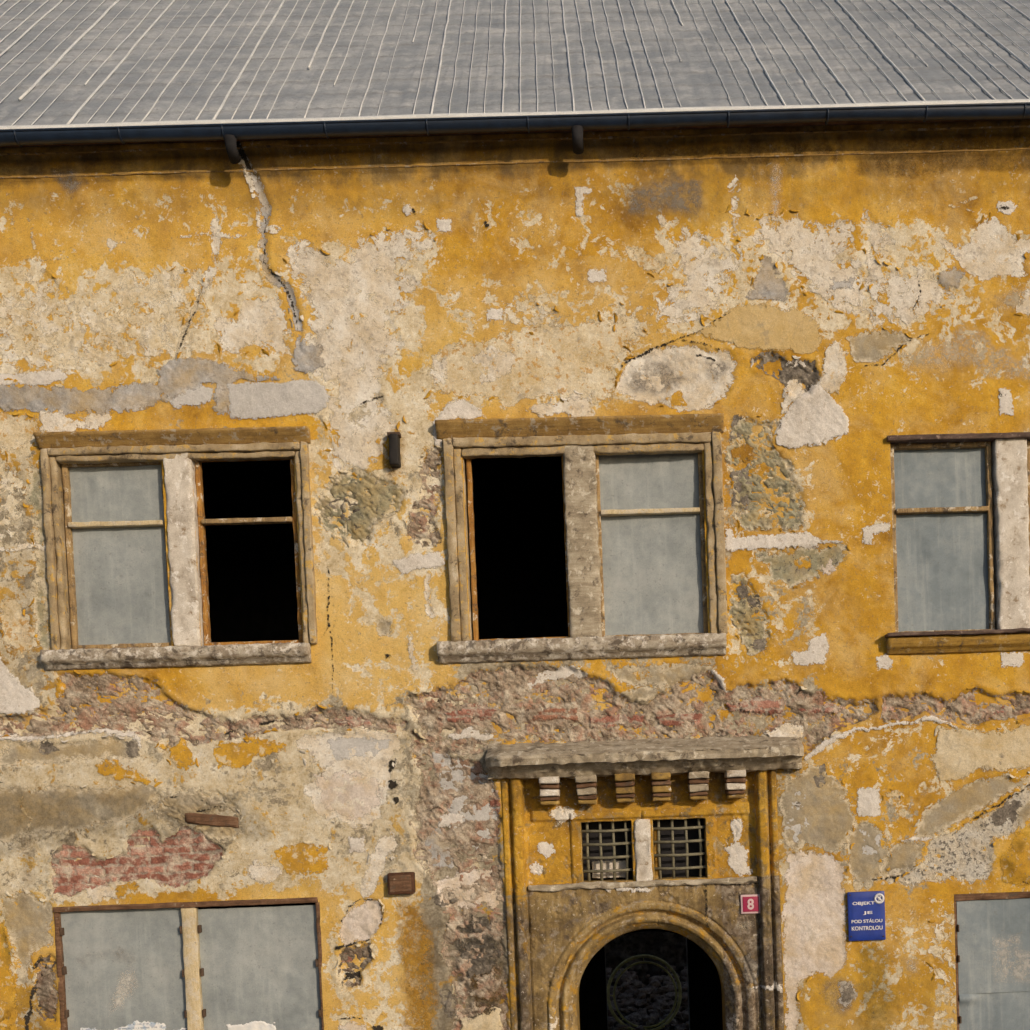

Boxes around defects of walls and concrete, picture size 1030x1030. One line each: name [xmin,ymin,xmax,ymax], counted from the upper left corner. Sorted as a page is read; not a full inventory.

peeling [0,192,292,388]
crack [236,141,304,347]
peeling [283,174,1030,548]
flaking render [724,414,851,589]
flaking render [0,662,1030,1030]